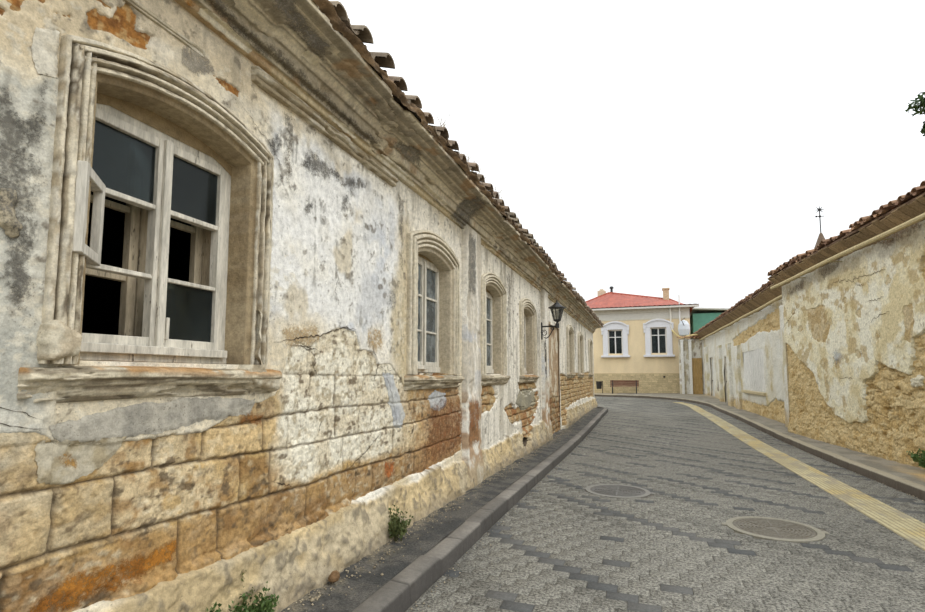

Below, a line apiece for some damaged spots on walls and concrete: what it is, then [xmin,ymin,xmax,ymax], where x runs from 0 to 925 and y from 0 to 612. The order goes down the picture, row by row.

peeling [0,0,24,16]
peeling [86,0,152,50]
peeling [213,75,239,97]
water stain [269,116,293,187]
water stain [0,88,46,310]
water stain [303,153,364,209]
crack [282,326,354,375]
flaking render [481,385,496,413]
flaking render [504,382,539,446]
flaking render [560,372,593,425]
flaking render [733,304,925,469]
flaking render [0,328,461,612]